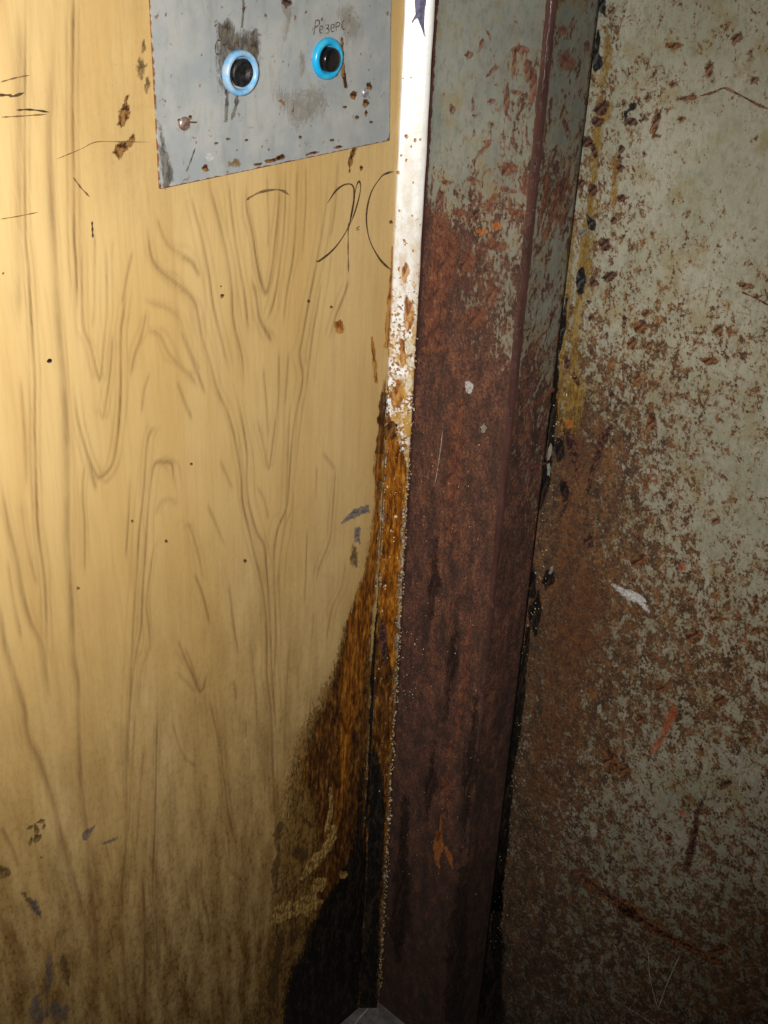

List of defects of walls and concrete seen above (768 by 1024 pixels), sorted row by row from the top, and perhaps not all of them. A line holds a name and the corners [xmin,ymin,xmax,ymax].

rust [487,45,537,120]
rust [650,107,663,136]
rust [435,162,517,234]
rust [402,239,414,283]
rust [523,29,626,550]
rust [622,310,654,350]
rust [645,413,657,432]
peeling [378,337,418,991]
rust [433,816,453,868]